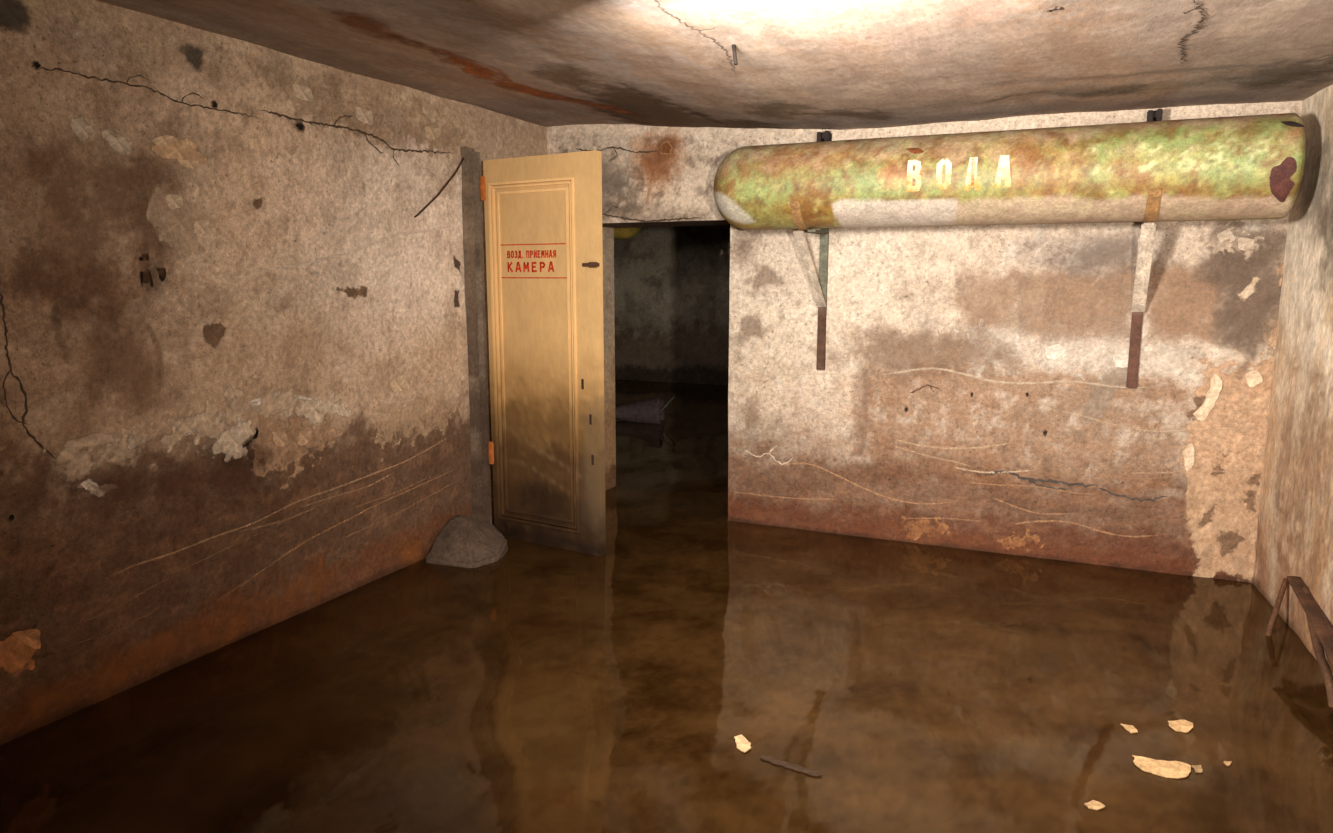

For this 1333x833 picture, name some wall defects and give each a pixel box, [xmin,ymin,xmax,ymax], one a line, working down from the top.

corrosion [332,12,636,115]
crack [1177,0,1213,63]
crack [31,67,453,166]
corrosion [1269,157,1297,202]
crack [0,281,79,491]
leakage [43,374,351,499]
leakage [137,381,463,565]
spalling [1180,321,1278,580]
corrosion [900,516,953,540]
corrosion [996,528,1044,552]
spalling [0,629,41,674]